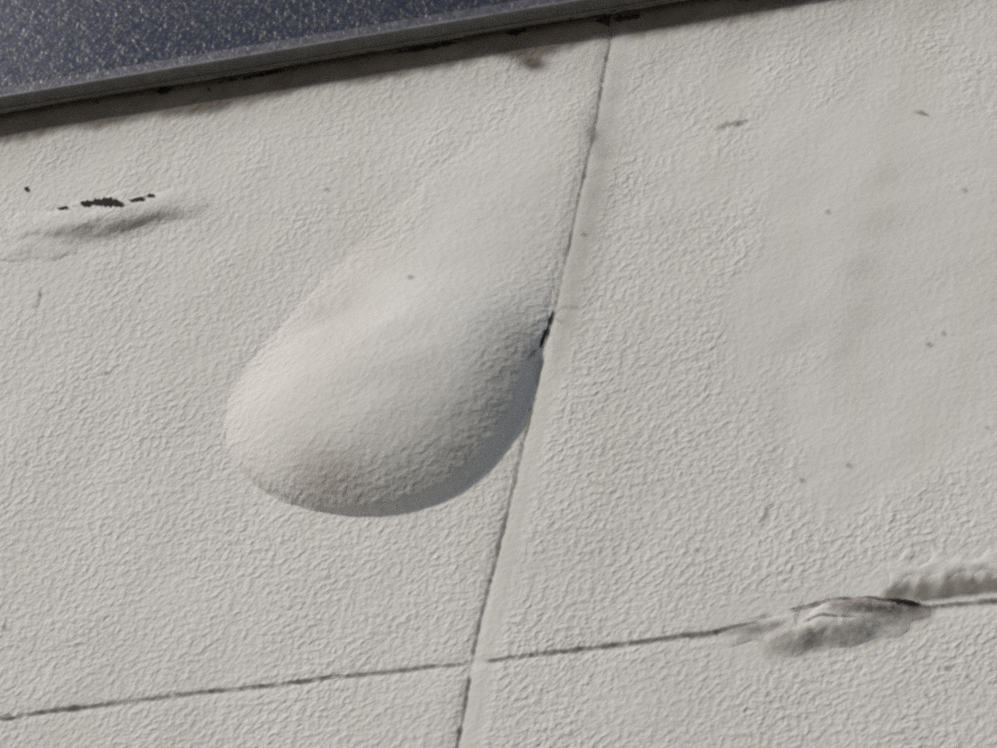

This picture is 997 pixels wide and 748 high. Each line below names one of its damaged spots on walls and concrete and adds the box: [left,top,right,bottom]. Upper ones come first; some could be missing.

crack [576,36,611,204]
spalling [80,193,154,206]
crack [148,294,753,748]
peeling [719,595,931,658]
crack [924,598,997,607]
crack [0,703,109,720]